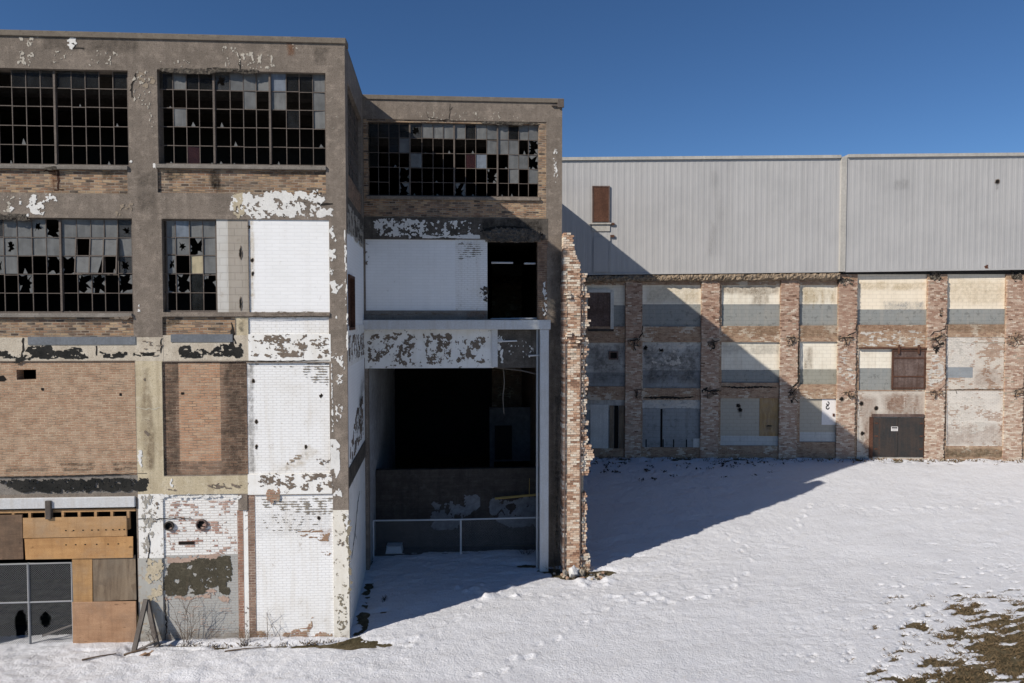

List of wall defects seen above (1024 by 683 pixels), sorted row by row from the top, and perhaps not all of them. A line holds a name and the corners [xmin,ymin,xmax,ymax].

peeling [229,189,483,300]
peeling [239,296,539,637]
peeling [141,479,242,633]